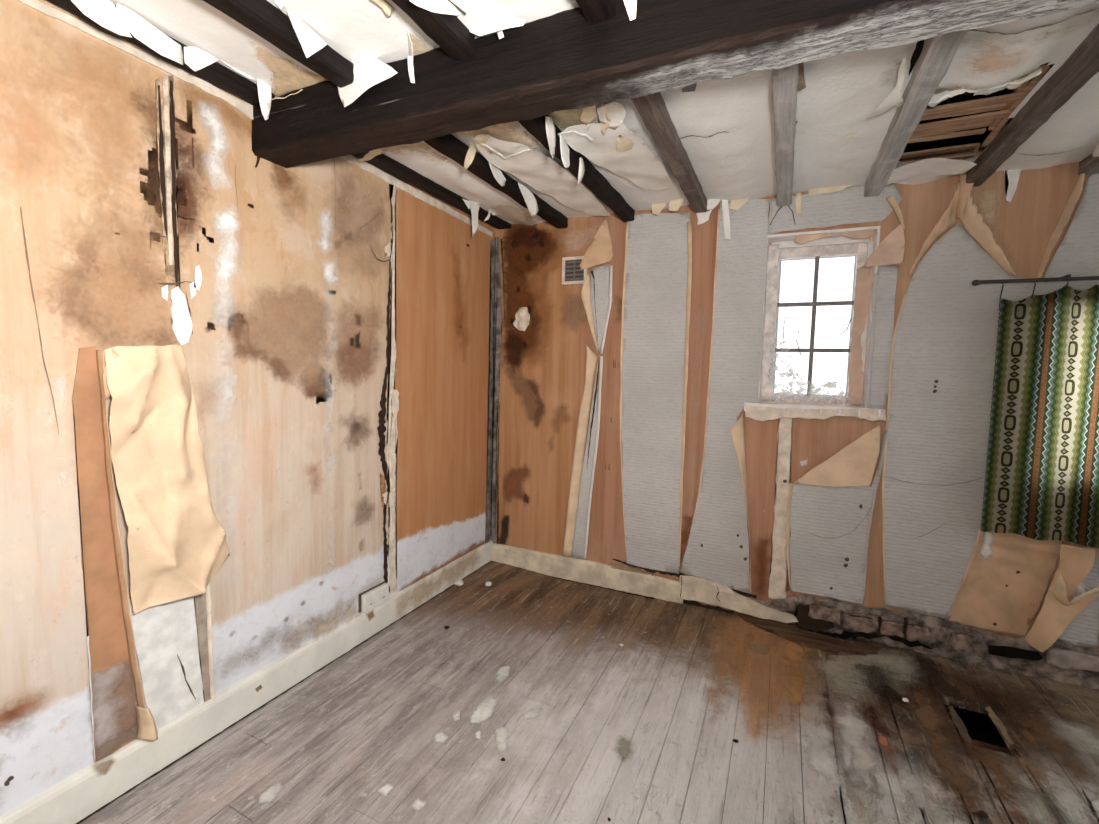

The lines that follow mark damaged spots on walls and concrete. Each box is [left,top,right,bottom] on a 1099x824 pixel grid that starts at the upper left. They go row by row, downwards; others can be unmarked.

leakage [216,212,238,311]
leakage [234,290,378,396]
crack [334,158,399,595]
leakage [498,206,587,423]
leakage [499,516,509,544]
leakage [504,468,529,503]
leakage [95,760,113,774]